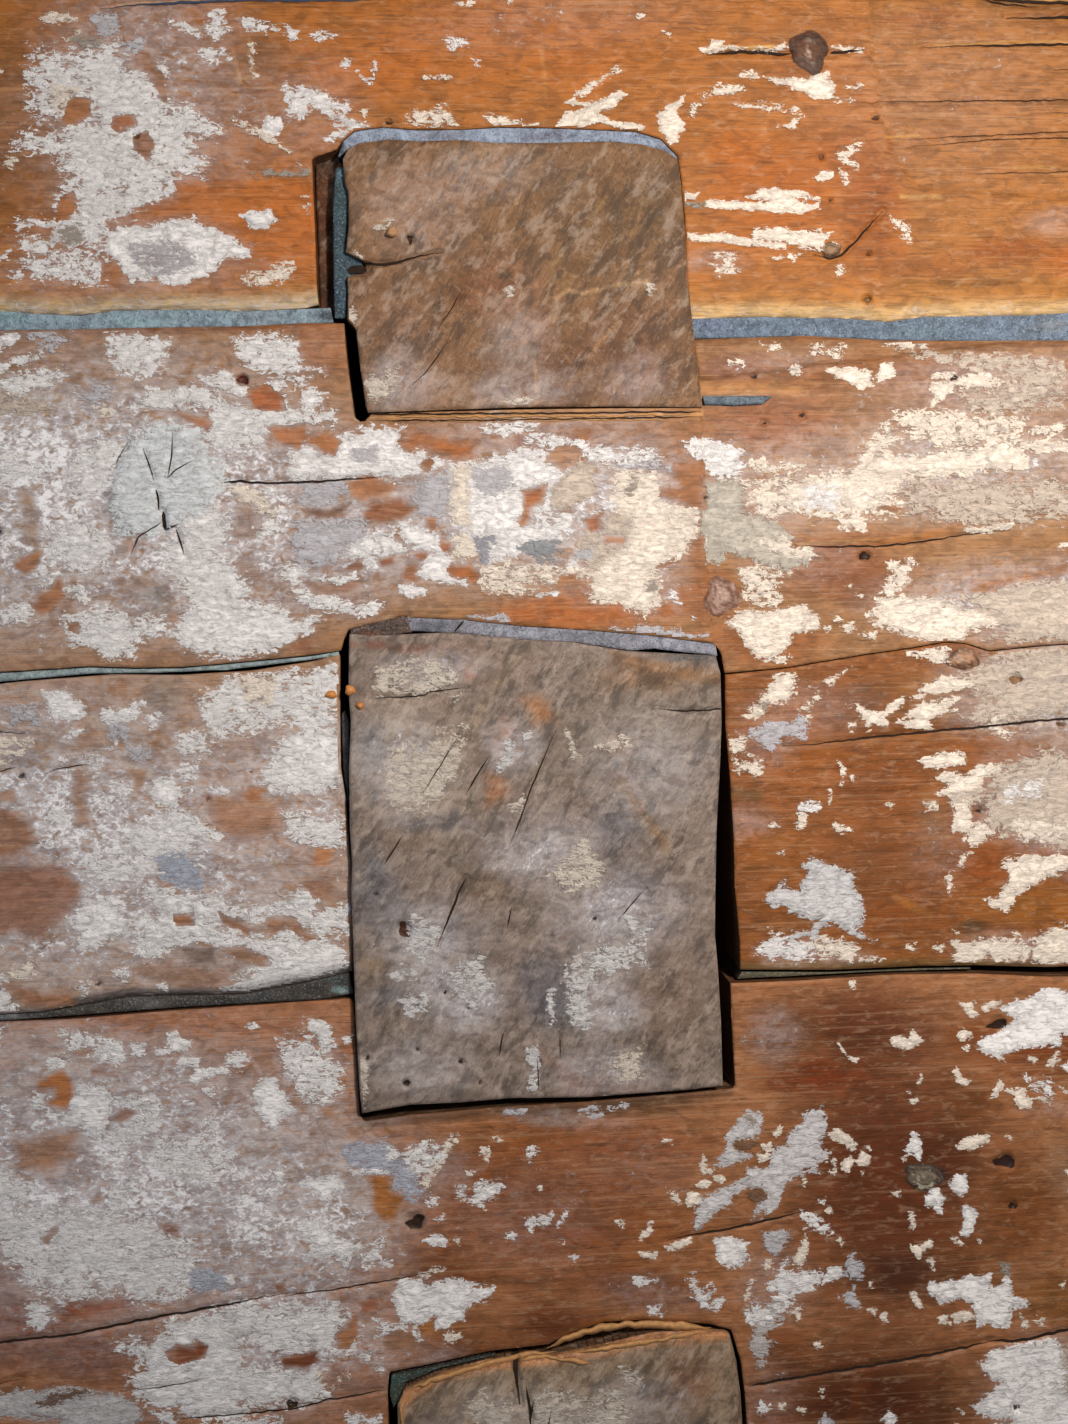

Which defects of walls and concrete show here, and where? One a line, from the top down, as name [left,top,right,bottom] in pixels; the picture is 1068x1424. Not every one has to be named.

peeling [0,8,370,289]
peeling [483,65,865,145]
peeling [699,39,789,56]
peeling [685,142,863,277]
crack [116,441,196,554]
peeling [26,1028,253,1194]
peeling [244,1017,370,1131]
peeling [890,1029,923,1050]
peeling [957,987,1068,1110]
peeling [0,1134,506,1424]
peeling [614,1105,888,1370]
peeling [891,1131,1068,1424]